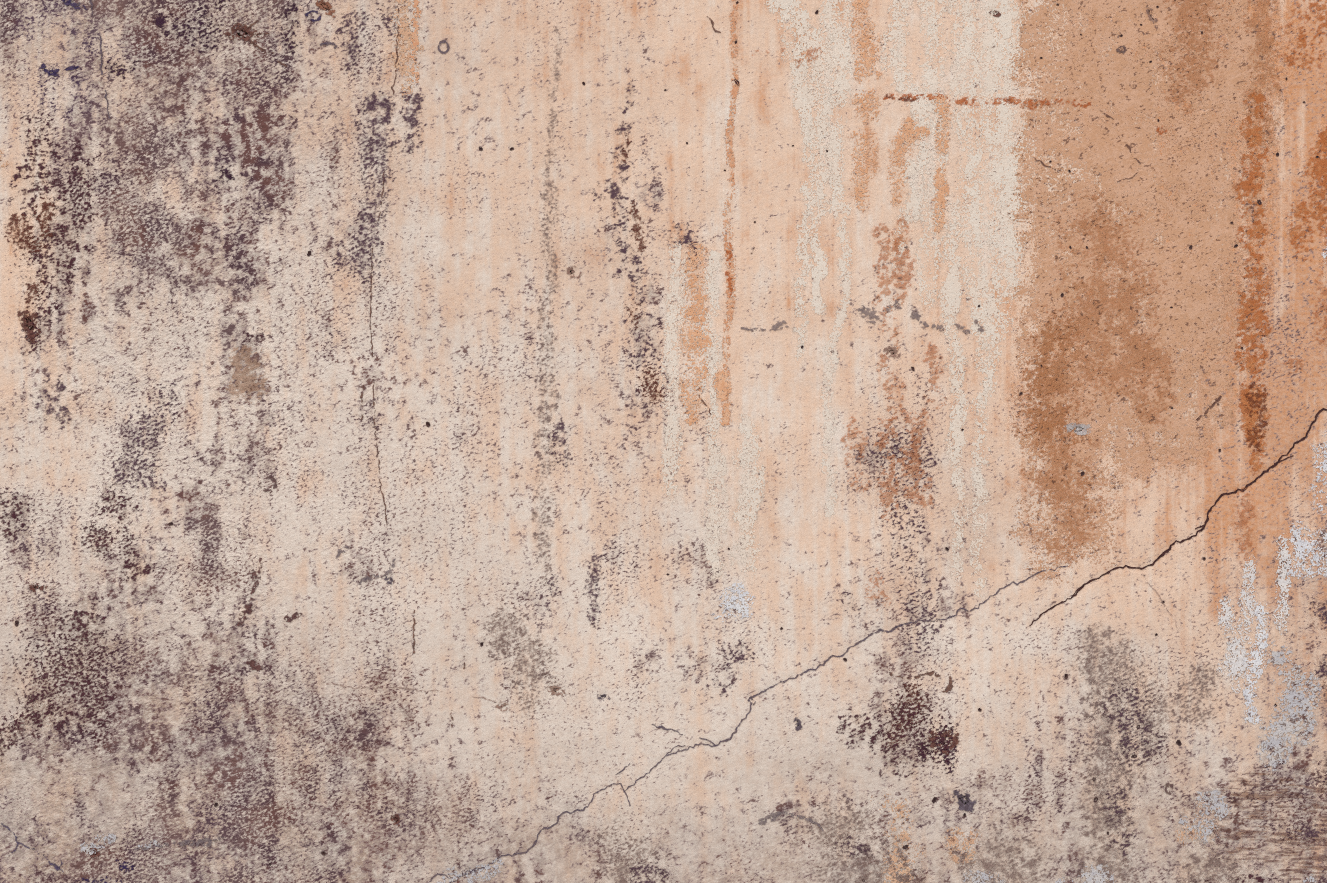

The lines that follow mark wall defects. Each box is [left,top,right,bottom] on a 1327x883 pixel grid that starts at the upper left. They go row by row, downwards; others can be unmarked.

rust [1285,0,1327,70]
damp [4,113,103,356]
damp [329,91,426,287]
rust [1234,93,1271,474]
rust [1290,127,1327,261]
damp [0,599,129,762]
damp [74,382,179,581]
crack [428,408,1327,883]
damp [836,683,959,780]
crack [1196,395,1222,421]
rust [1235,487,1255,569]
damp [1217,434,1327,771]